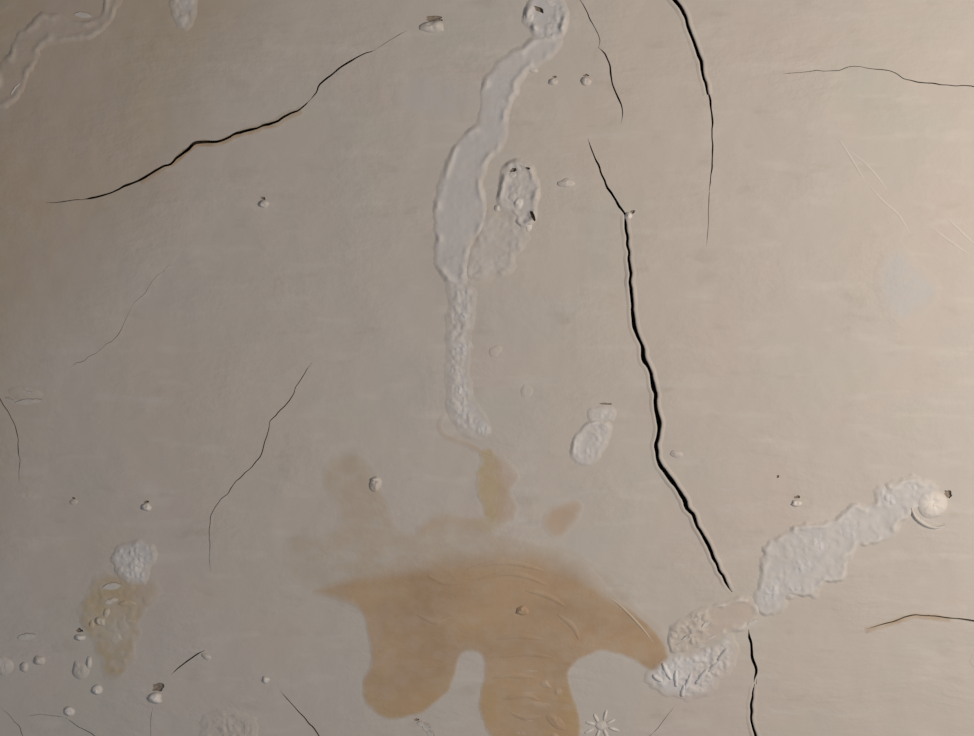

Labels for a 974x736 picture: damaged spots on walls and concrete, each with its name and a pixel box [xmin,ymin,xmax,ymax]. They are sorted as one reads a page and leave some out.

crack [46,34,400,203]
crack [666,0,714,246]
crack [785,66,974,87]
peeling [494,157,541,232]
water stain [282,0,740,736]
crack [588,140,735,594]
crack [209,363,312,571]
water stain [76,538,163,680]
crack [282,693,319,736]
crack [746,630,761,736]
crack [871,614,974,628]